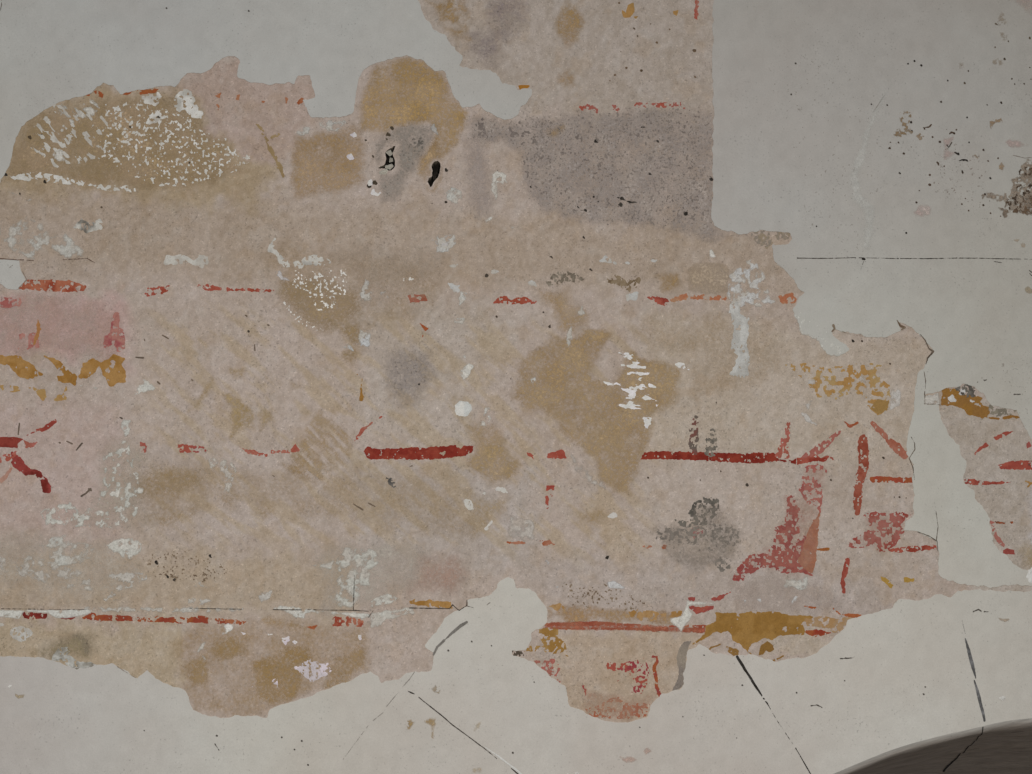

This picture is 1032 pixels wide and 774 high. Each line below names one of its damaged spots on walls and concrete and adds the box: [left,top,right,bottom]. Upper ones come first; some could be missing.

flaking render [925,384,1032,570]
crack [273,575,373,618]
crack [409,602,489,655]
crack [343,672,522,774]
crack [736,655,811,774]
crack [943,622,986,772]